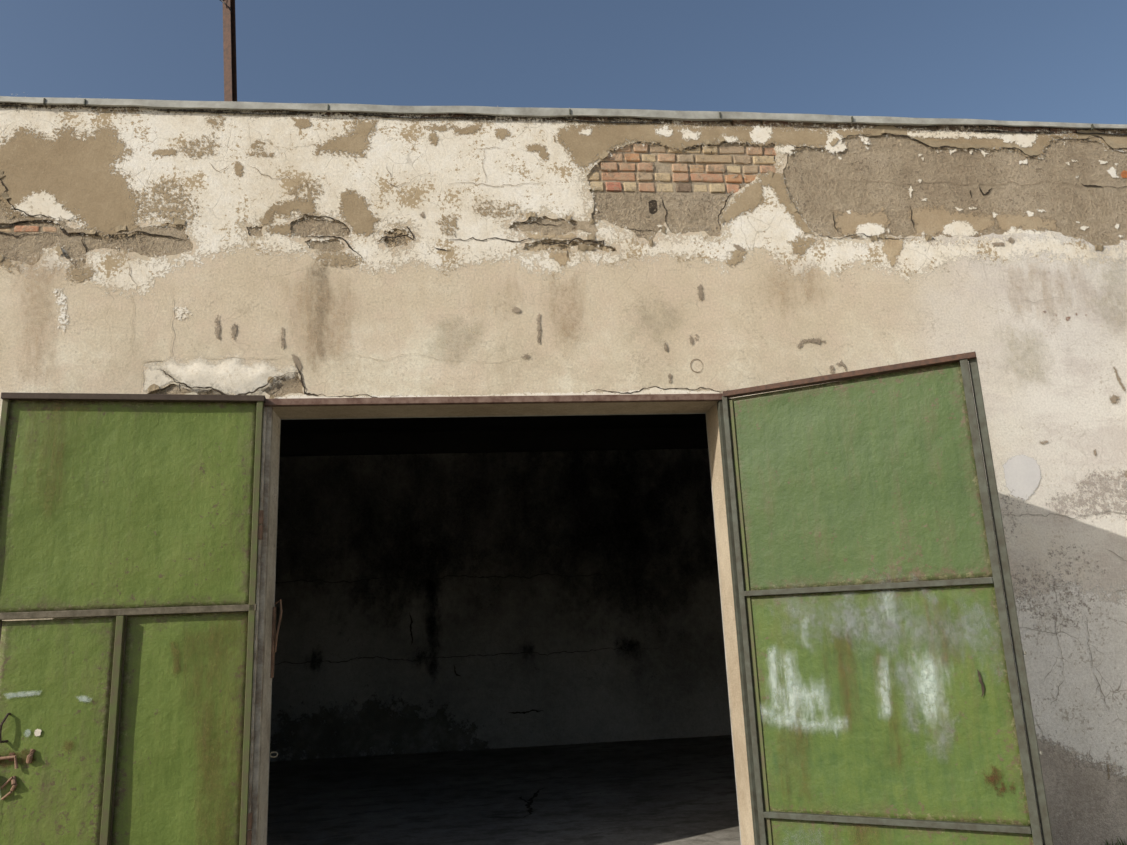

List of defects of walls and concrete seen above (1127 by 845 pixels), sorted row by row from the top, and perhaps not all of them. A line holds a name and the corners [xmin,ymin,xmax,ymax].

flaking render [149,113,226,161]
flaking render [423,123,512,146]
flaking render [0,121,202,331]
flaking render [420,211,459,238]
spalling [472,118,1127,268]
crack [635,125,1127,239]
spalling [143,368,234,395]
spalling [257,327,304,399]
crack [1019,605,1111,704]
water stain [270,686,489,762]